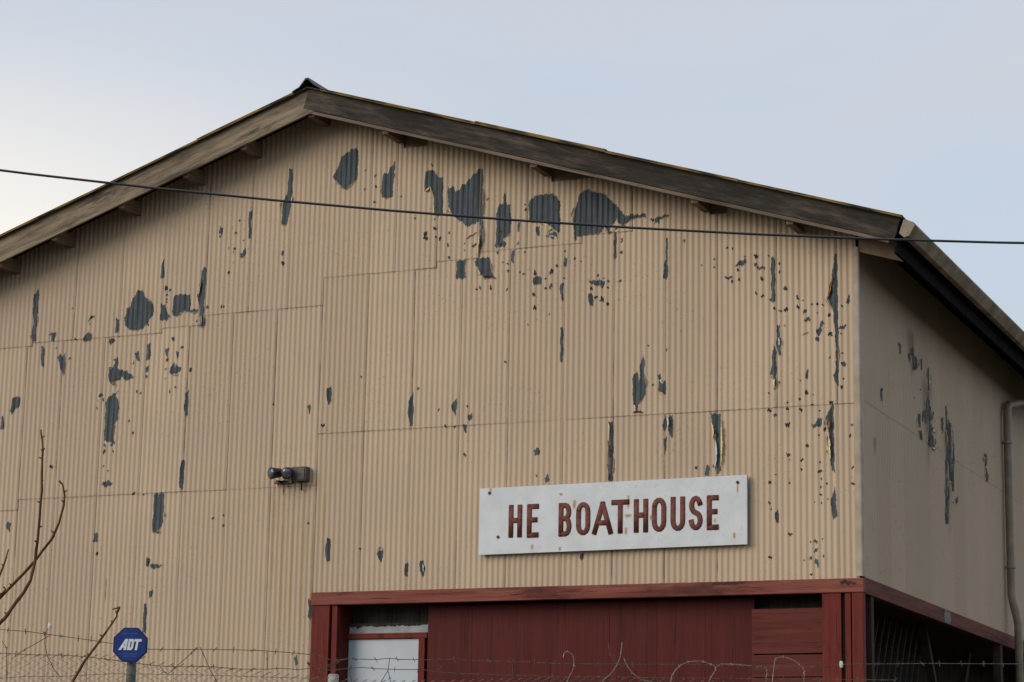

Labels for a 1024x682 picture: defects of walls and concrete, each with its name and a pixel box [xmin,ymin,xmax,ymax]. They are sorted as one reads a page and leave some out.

peeling [279,168,293,225]
peeling [333,148,402,203]
peeling [423,163,669,310]
peeling [30,290,71,376]
peeling [109,260,225,346]
peeling [96,343,151,488]
peeling [165,337,192,417]
peeling [632,345,666,413]
peeling [695,412,723,476]
peeling [767,369,837,520]
peeling [898,343,958,524]
peeling [132,492,164,533]